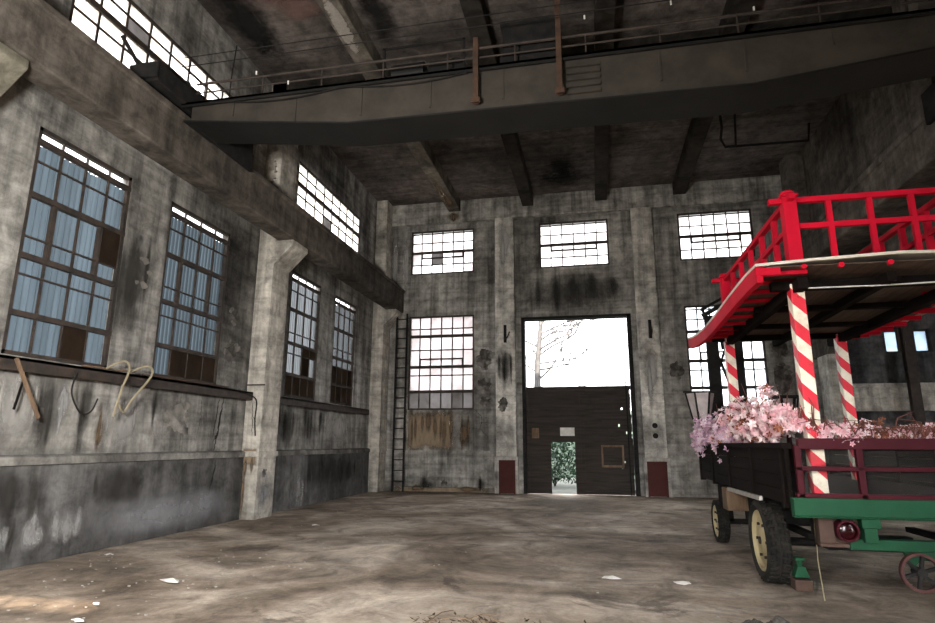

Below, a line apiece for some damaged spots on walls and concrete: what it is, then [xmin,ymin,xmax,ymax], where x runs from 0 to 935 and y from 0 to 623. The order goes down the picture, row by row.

damp [361,0,395,41]
damp [0,383,68,443]
damp [78,390,91,436]
damp [0,480,40,552]
damp [52,514,80,539]